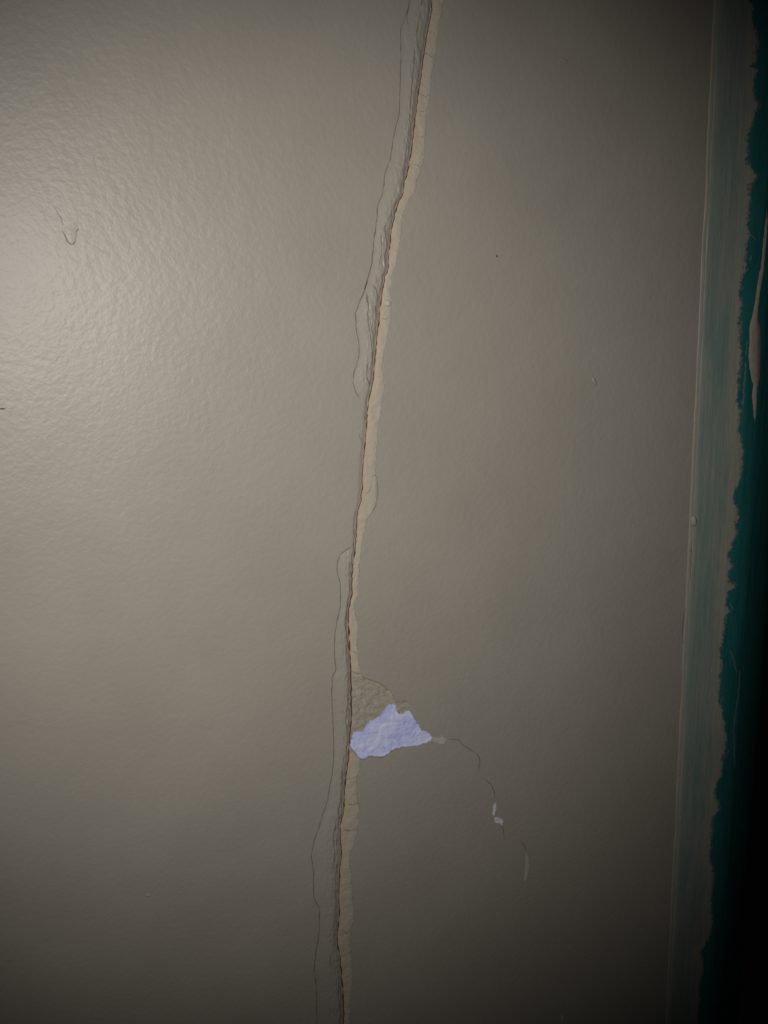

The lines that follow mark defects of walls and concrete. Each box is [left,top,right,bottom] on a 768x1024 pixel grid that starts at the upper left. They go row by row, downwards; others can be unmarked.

crack [337,0,444,1024]
peeling [350,671,446,759]